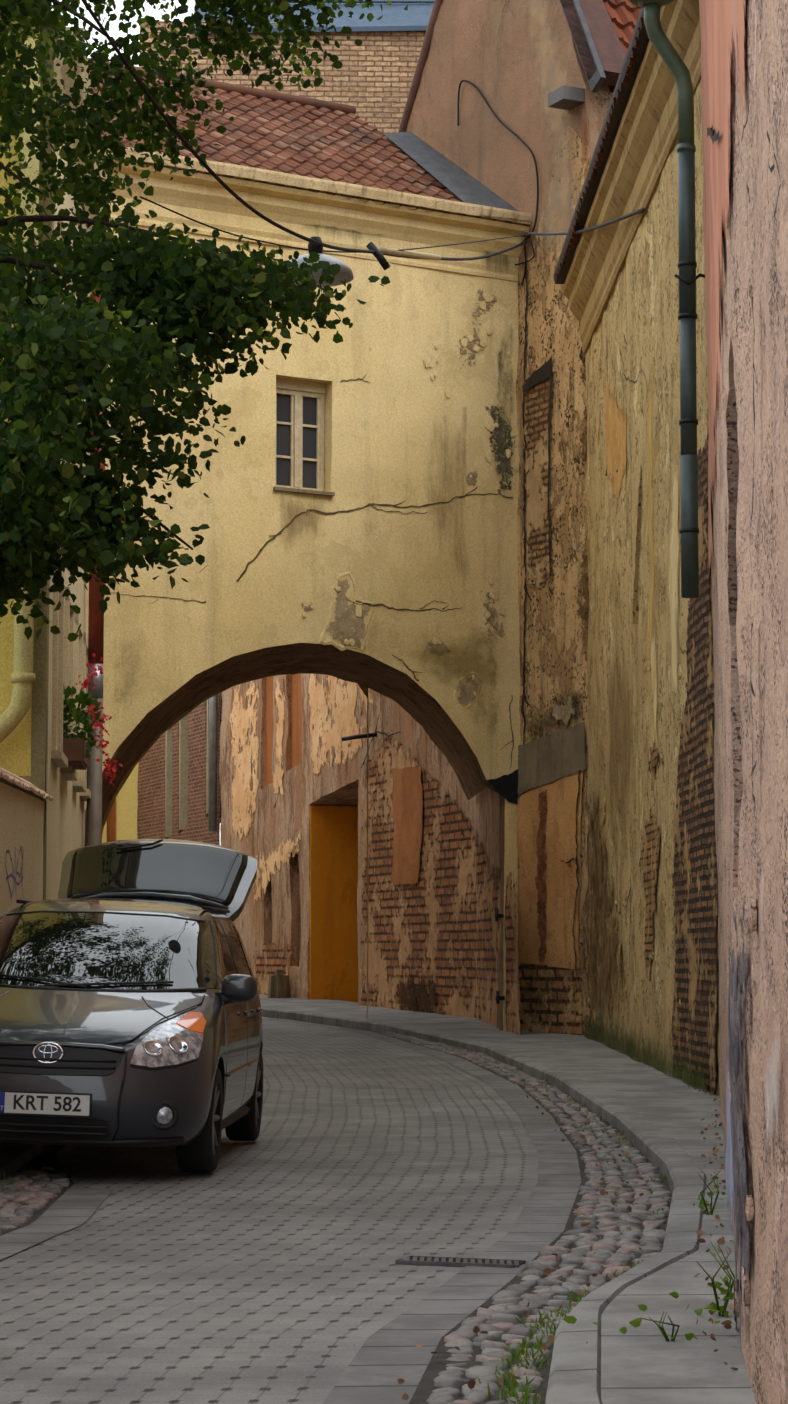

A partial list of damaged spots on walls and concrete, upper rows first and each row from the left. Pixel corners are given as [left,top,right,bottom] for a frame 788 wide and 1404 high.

flaking render [465,405,520,493]
spalling [579,353,587,470]
crack [110,592,206,604]
flaking render [300,571,374,652]
crack [237,275,532,794]
flaking render [480,577,506,640]
spalling [578,498,589,679]
flaking render [308,670,627,1040]
flaking render [639,417,757,1347]